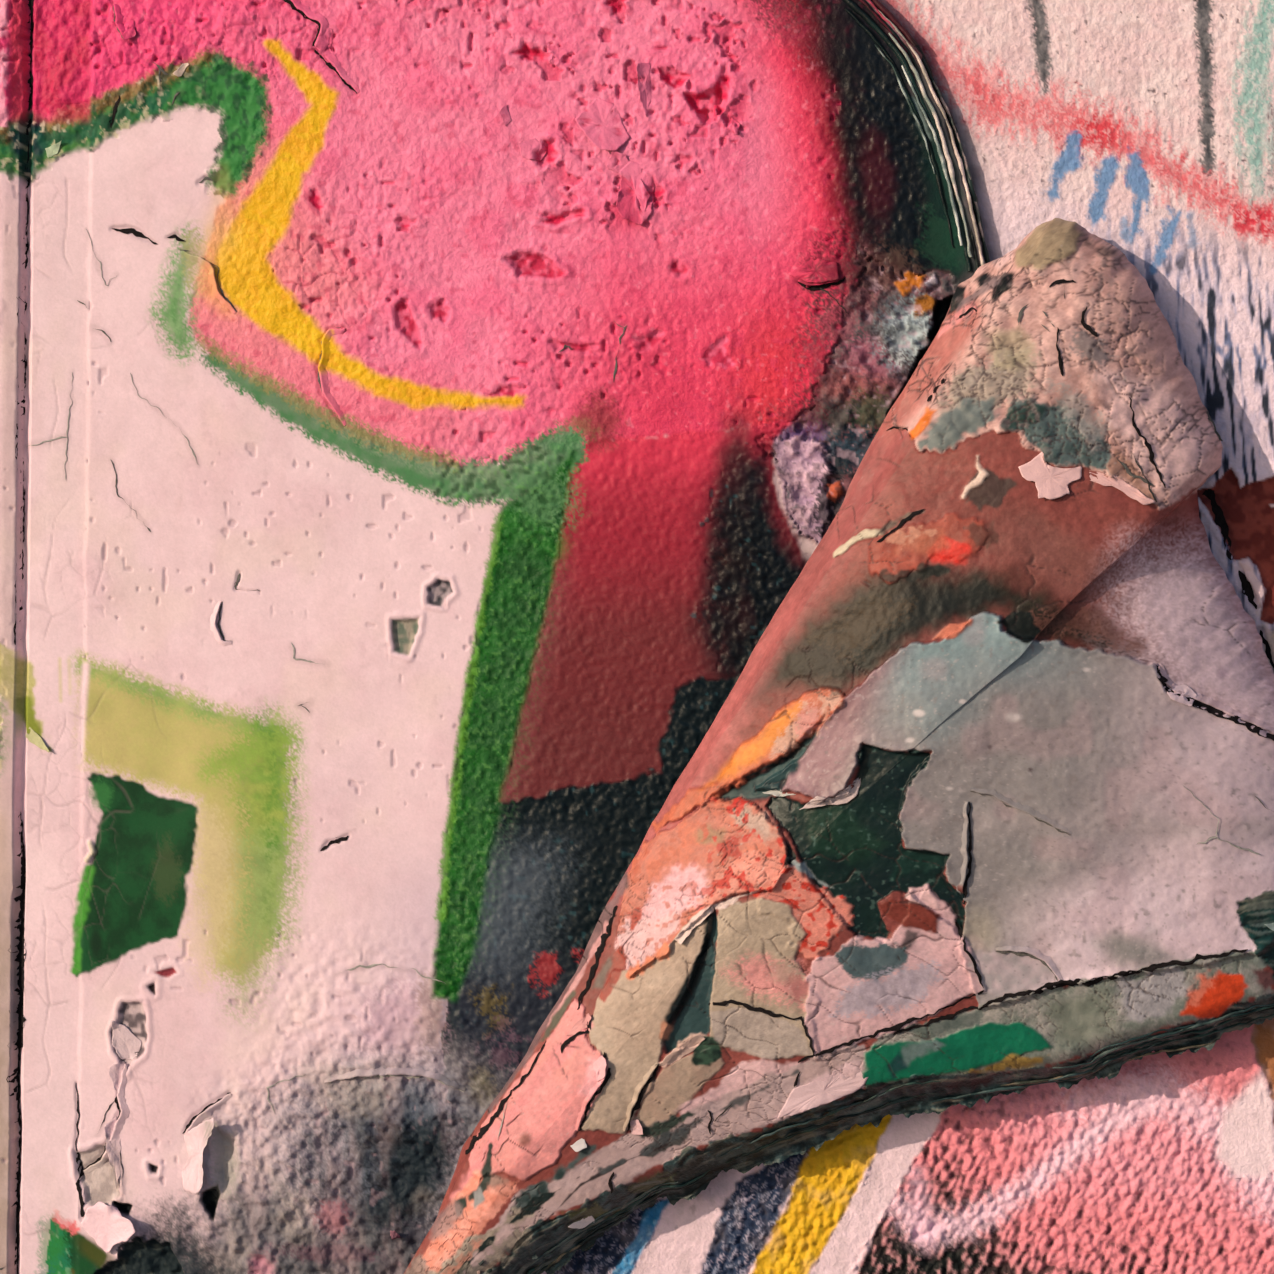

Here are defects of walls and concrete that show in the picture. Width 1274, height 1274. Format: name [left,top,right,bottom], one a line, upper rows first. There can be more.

crack [284,0,359,93]
peeling [499,104,511,126]
peeling [637,62,652,117]
peeling [606,151,655,225]
crack [318,327,346,426]
peeling [391,579,455,657]
peeling [404,218,1274,1274]
crack [0,812,26,1274]
peeling [109,967,179,1092]
spalling [75,1116,185,1274]
peeling [182,1118,215,1195]